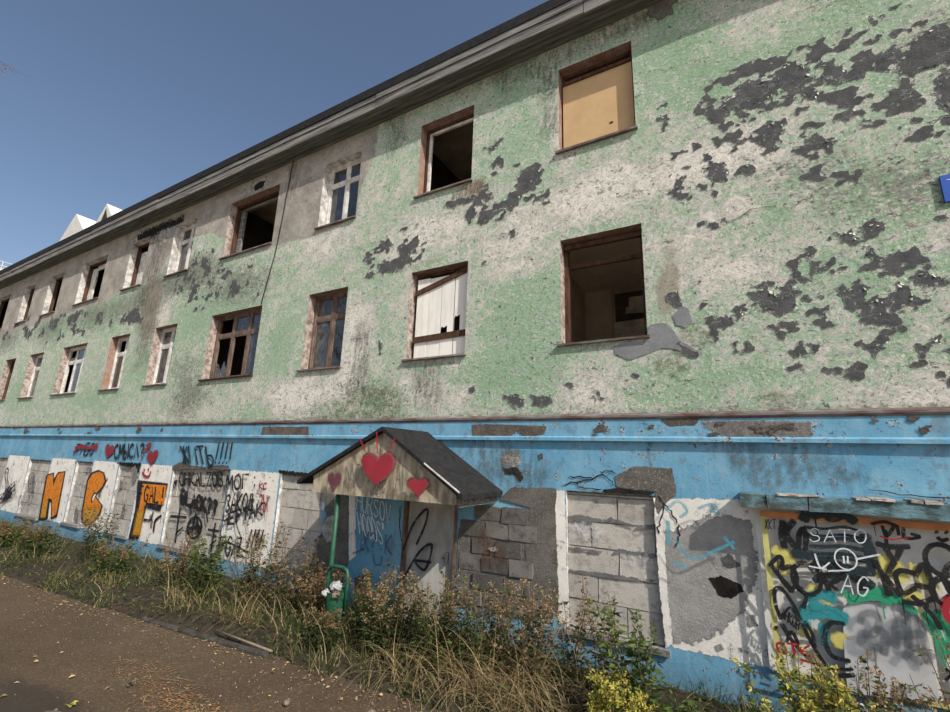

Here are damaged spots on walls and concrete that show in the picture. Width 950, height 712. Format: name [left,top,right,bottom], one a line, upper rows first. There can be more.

peeling [656,101,670,133]
peeling [667,2,950,201]
peeling [445,137,550,225]
peeling [363,223,427,278]
peeling [174,248,259,312]
peeling [613,217,950,381]
peeling [2,306,143,350]
peeling [503,393,553,409]
crack [563,470,617,490]
spalling [603,466,676,514]
spalling [664,514,759,652]